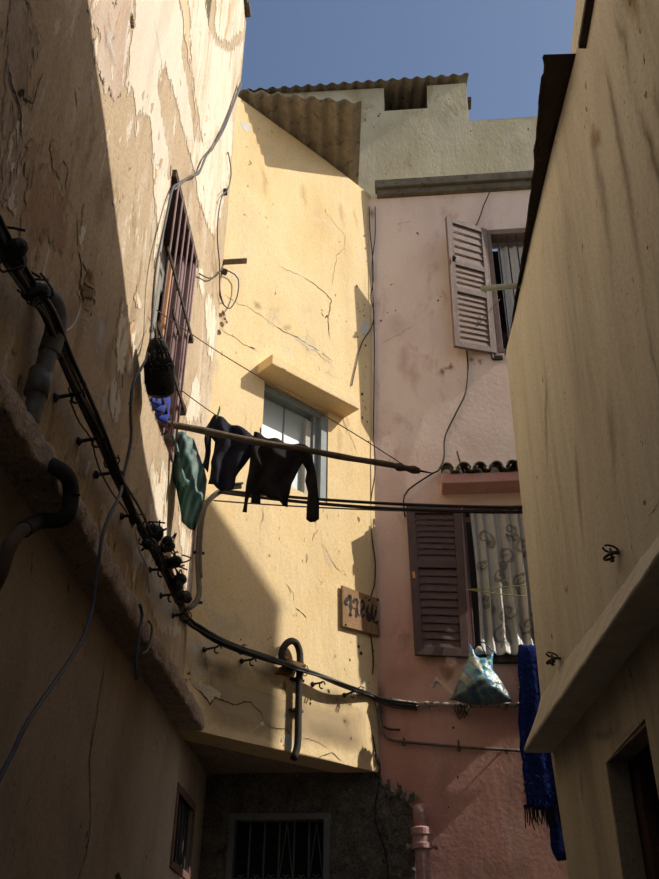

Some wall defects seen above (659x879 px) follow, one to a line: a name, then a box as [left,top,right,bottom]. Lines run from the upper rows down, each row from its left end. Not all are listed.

flaking render [89,0,251,269]
crack [223,210,346,369]
crack [192,685,340,760]